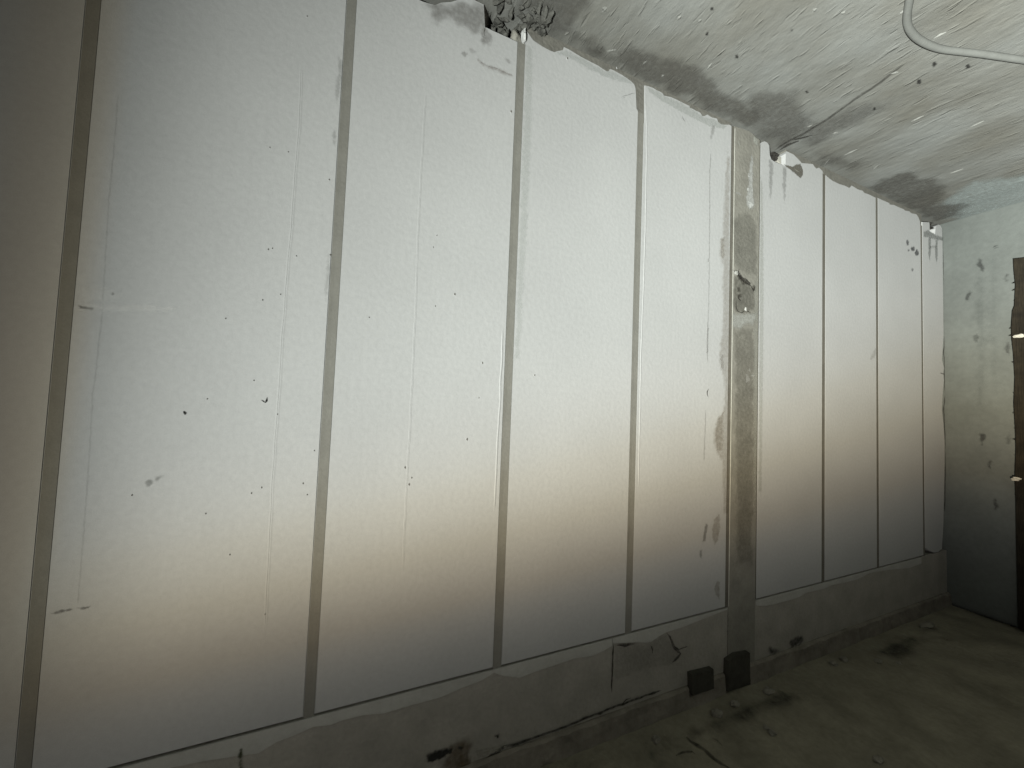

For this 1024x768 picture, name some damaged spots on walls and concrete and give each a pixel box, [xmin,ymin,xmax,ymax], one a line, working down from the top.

spalling [485,0,554,37]
damp [746,157,754,208]
crack [478,646,661,757]
spalling [427,747,463,762]